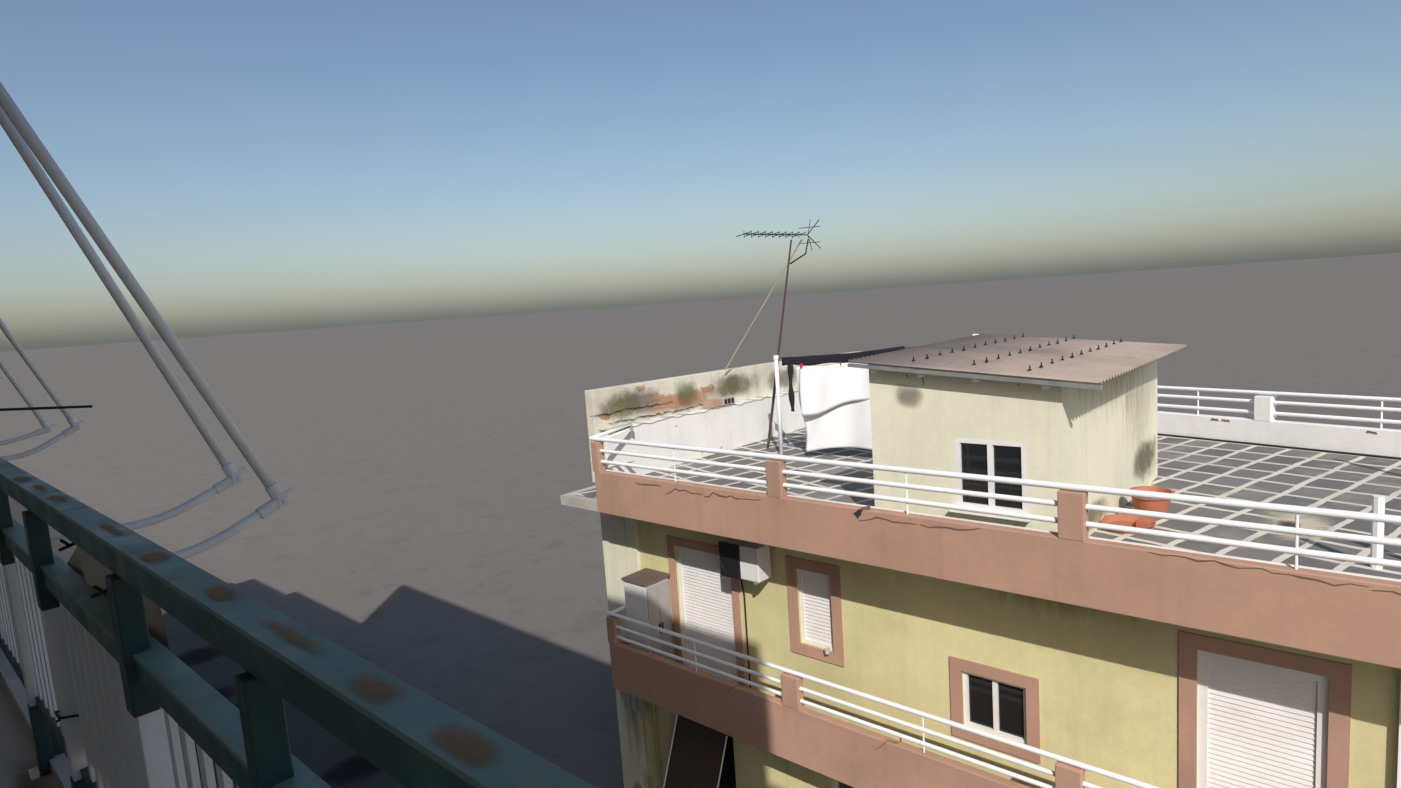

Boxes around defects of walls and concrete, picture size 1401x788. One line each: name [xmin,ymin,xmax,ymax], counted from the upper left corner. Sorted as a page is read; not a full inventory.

damp [770,370,794,386]
damp [604,376,750,415]
damp [899,390,918,403]
damp [1135,433,1401,475]
crack [636,483,761,500]
crack [859,516,981,531]
damp [1088,502,1103,528]
crack [1149,552,1401,595]